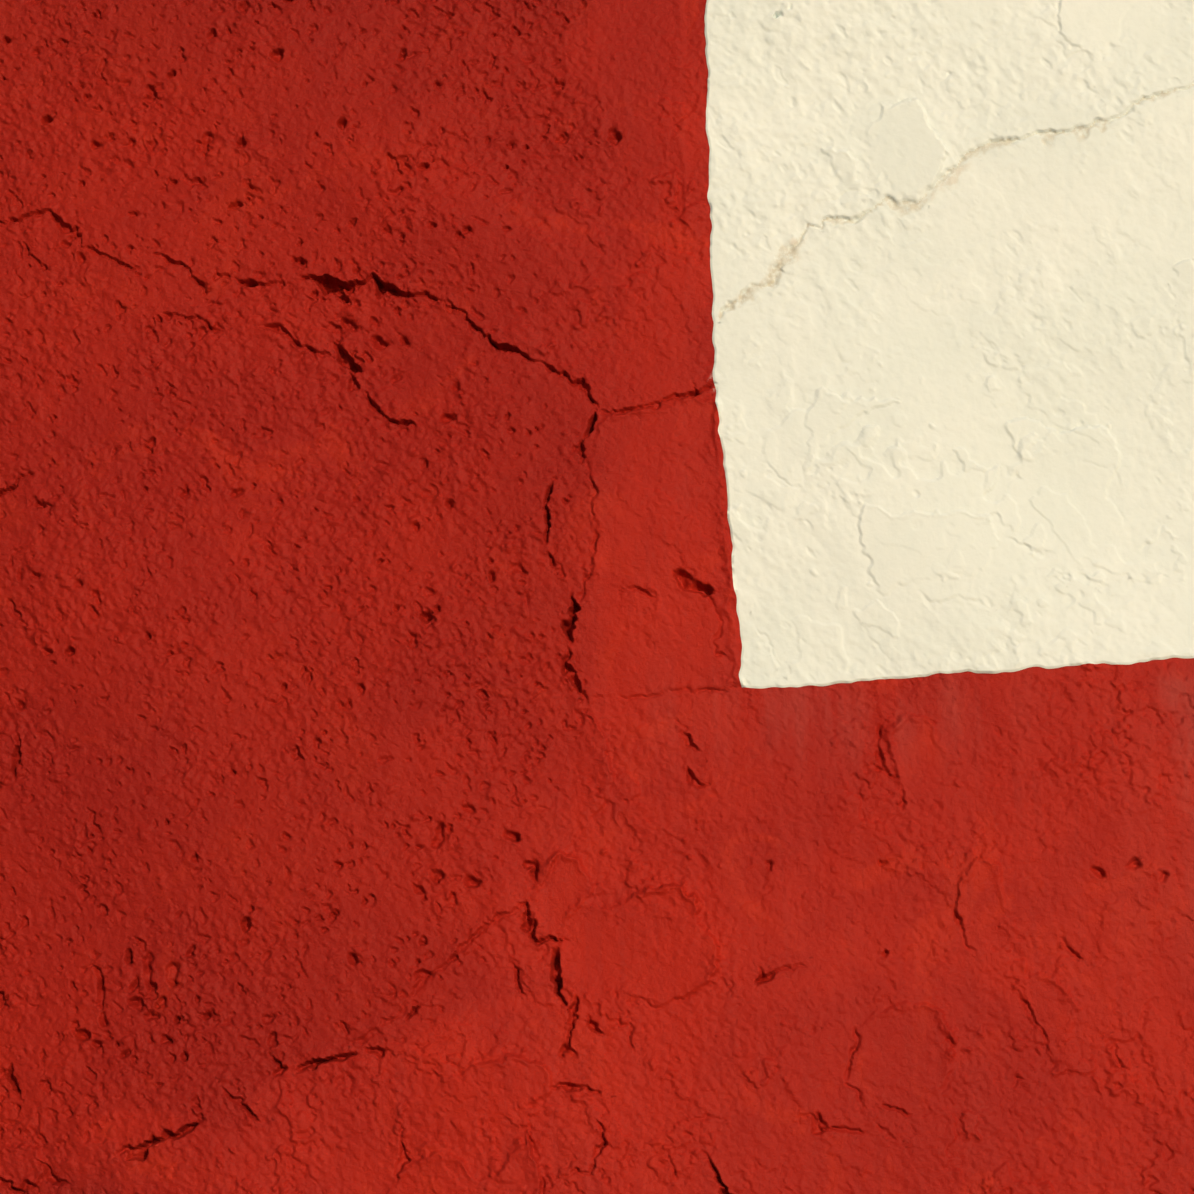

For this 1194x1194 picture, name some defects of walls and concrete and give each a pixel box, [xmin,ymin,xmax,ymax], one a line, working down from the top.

crack [712,68,1194,322]
crack [0,201,728,714]
crack [0,1063,80,1194]
crack [112,1075,269,1162]
crack [271,978,432,1079]
crack [393,1106,423,1194]
crack [508,855,712,1194]
crack [678,1097,738,1194]
crack [754,955,816,986]
crack [788,1024,921,1146]